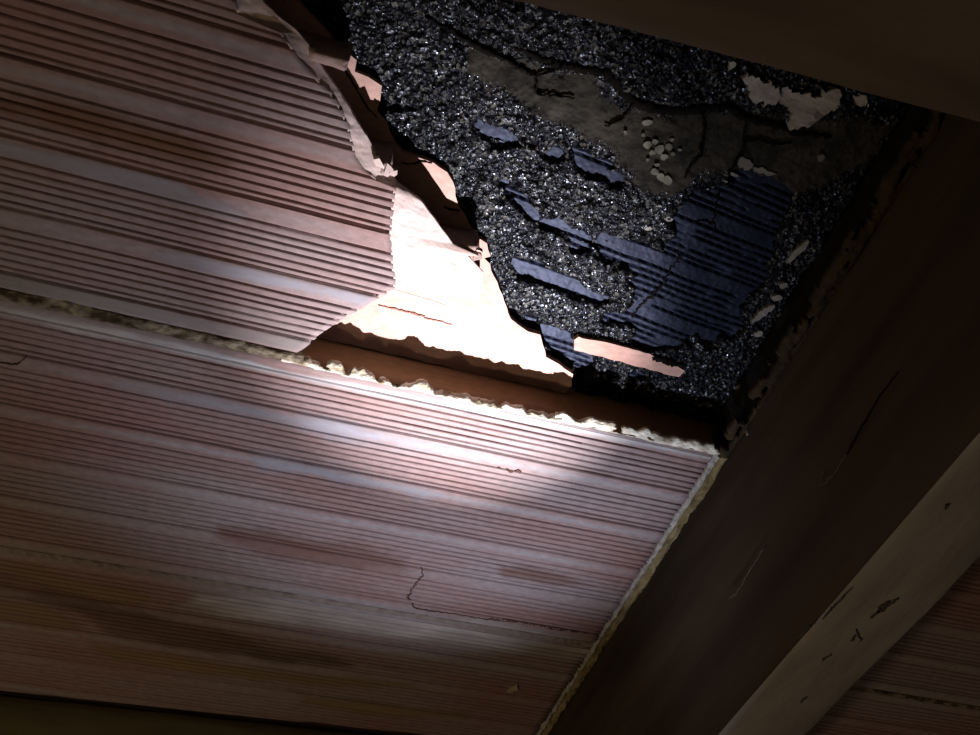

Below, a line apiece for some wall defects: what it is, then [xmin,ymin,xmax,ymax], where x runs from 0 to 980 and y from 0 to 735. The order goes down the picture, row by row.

spalling [236,0,484,308]
flaking render [742,72,868,131]
spalling [717,109,950,458]
crack [406,567,587,634]